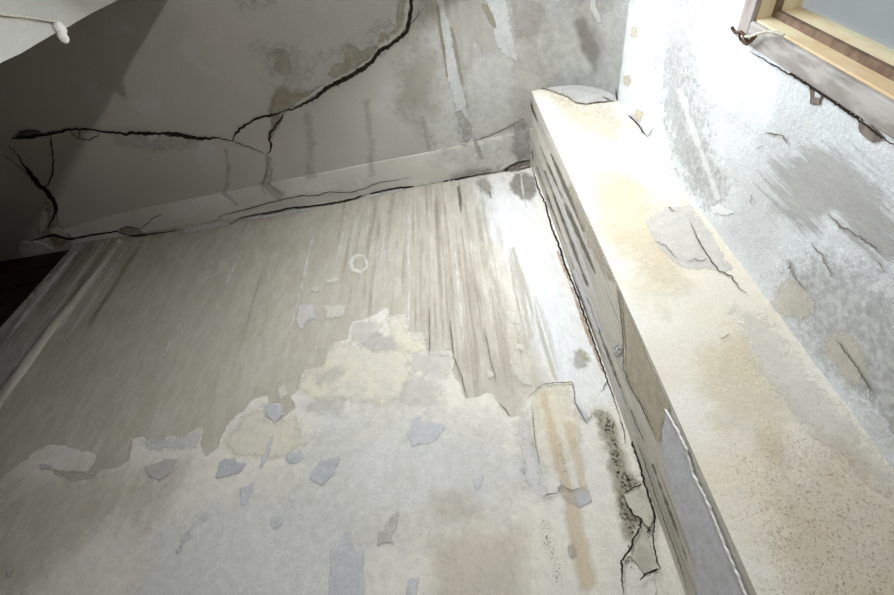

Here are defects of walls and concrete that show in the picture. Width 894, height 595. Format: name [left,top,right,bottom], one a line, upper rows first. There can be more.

crack [4,0,421,241]
peeling [294,0,405,92]
peeling [647,0,732,272]
peeling [295,303,345,329]
water stain [0,0,652,568]
peeling [0,308,657,595]
crack [219,153,688,594]
water stain [652,464,679,537]